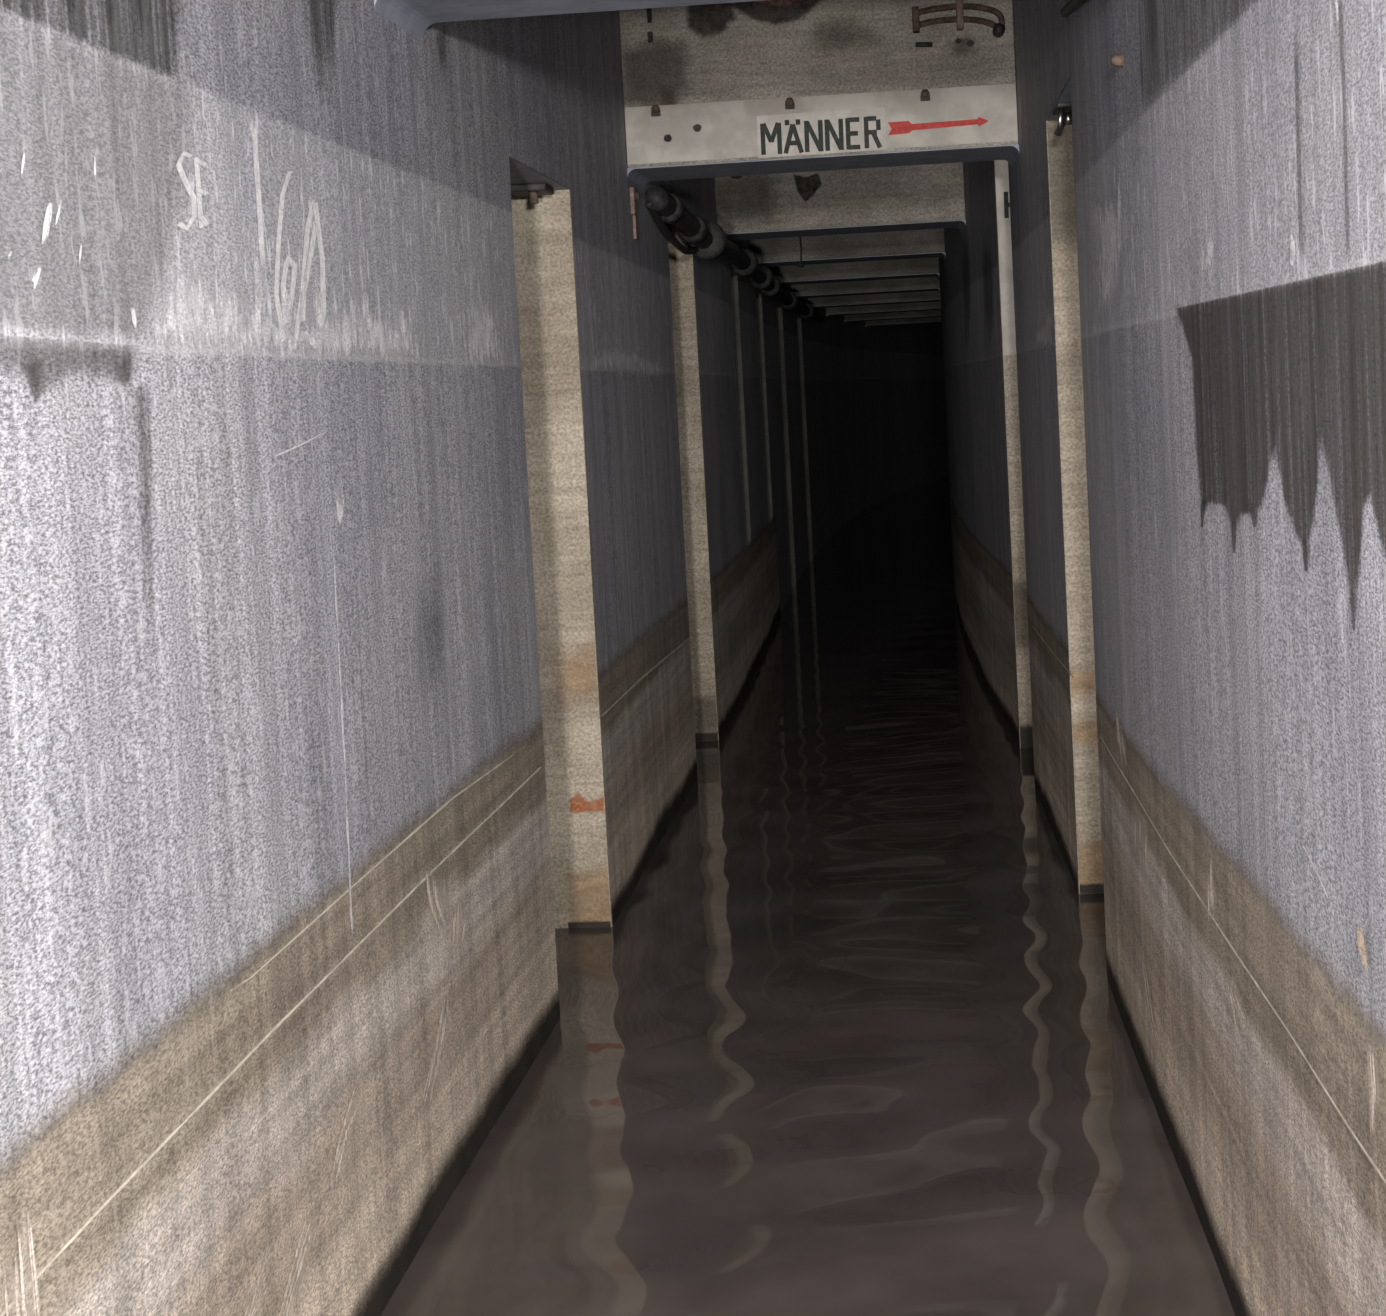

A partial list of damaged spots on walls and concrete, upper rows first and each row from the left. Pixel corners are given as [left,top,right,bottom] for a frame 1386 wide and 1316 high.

leakage [42,203,61,242]
leakage [1092,185,1122,314]
leakage [154,262,418,362]
leakage [1034,304,1054,348]
leakage [1177,64,1386,631]
corrosion [570,796,604,813]
leakage [952,503,1386,1316]